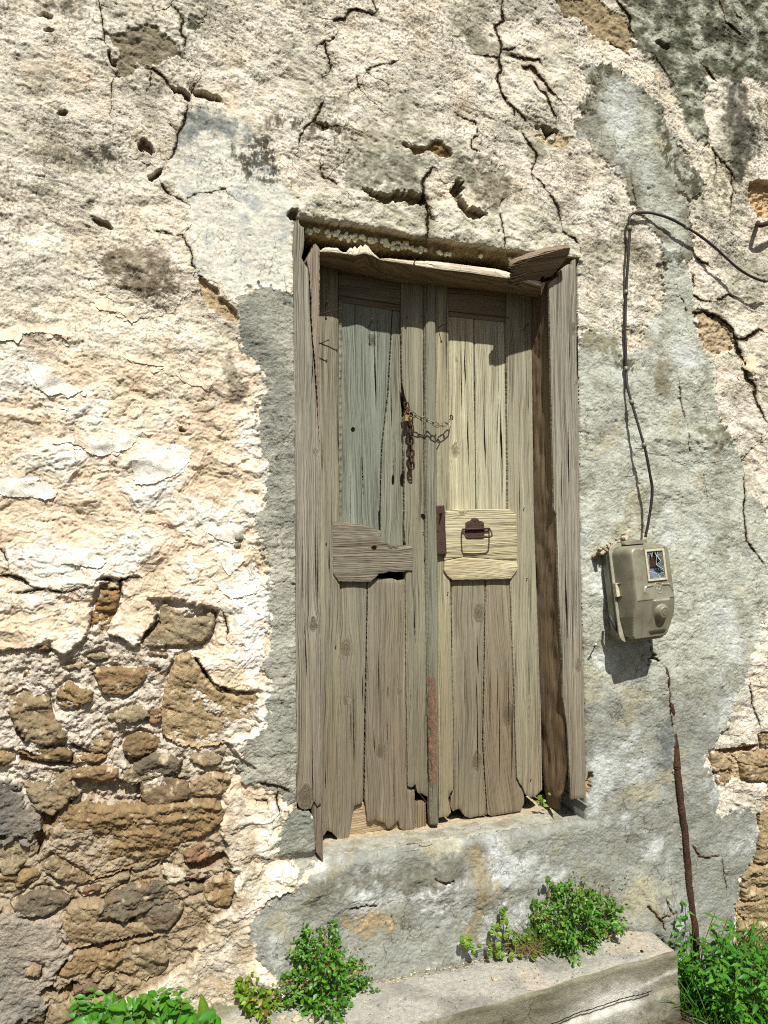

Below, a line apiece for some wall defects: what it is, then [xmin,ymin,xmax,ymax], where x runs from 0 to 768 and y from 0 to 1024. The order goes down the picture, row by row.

spalling [555,0,637,52]
crack [90,0,238,280]
crack [292,1,409,199]
crack [436,1,581,252]
leakage [721,80,758,175]
crack [418,167,435,250]
spalling [747,181,768,219]
spalling [694,309,733,355]
crack [654,255,767,564]
crack [0,549,154,599]